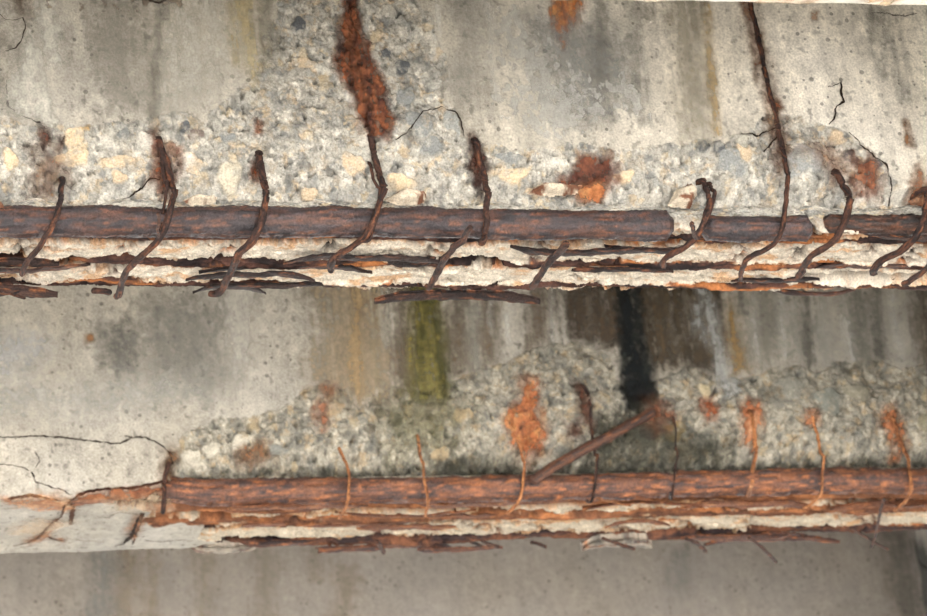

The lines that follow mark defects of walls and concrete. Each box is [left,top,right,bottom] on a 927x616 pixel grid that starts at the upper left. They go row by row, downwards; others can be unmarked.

corrosion [333,0,395,137]
crack [396,106,464,140]
spalling [0,0,927,292]
crack [828,82,892,206]
corrosion [185,252,448,294]
corrosion [510,244,678,273]
corrosion [731,263,913,297]
leakage [308,286,508,406]
leakage [525,286,922,474]
crack [0,435,191,546]
leakage [347,457,521,477]
spalling [116,341,927,554]